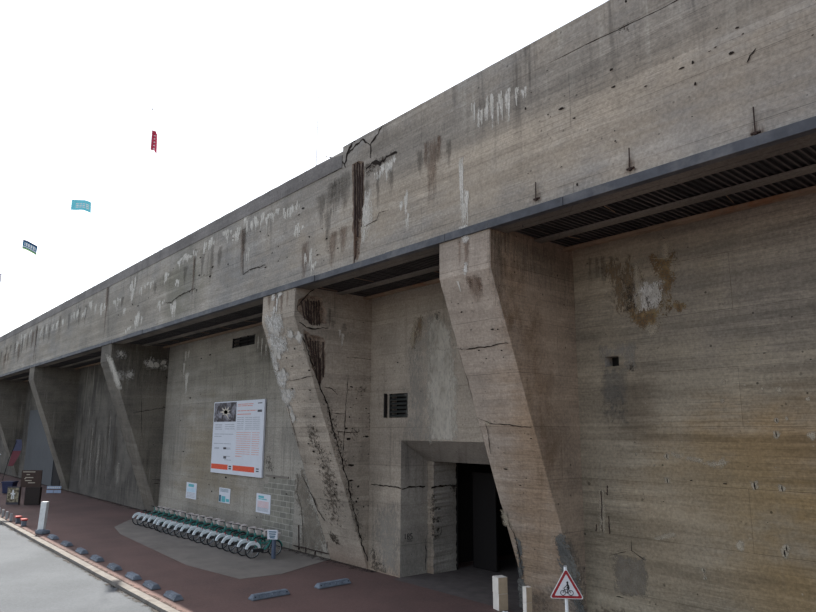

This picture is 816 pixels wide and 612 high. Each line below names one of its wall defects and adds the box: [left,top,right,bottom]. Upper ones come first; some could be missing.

water stain [471,86,527,127]
crack [320,125,397,179]
water stain [222,201,304,243]
water stain [177,237,214,268]
spalling [606,241,686,336]
peeling [257,289,345,555]
crack [296,336,457,561]